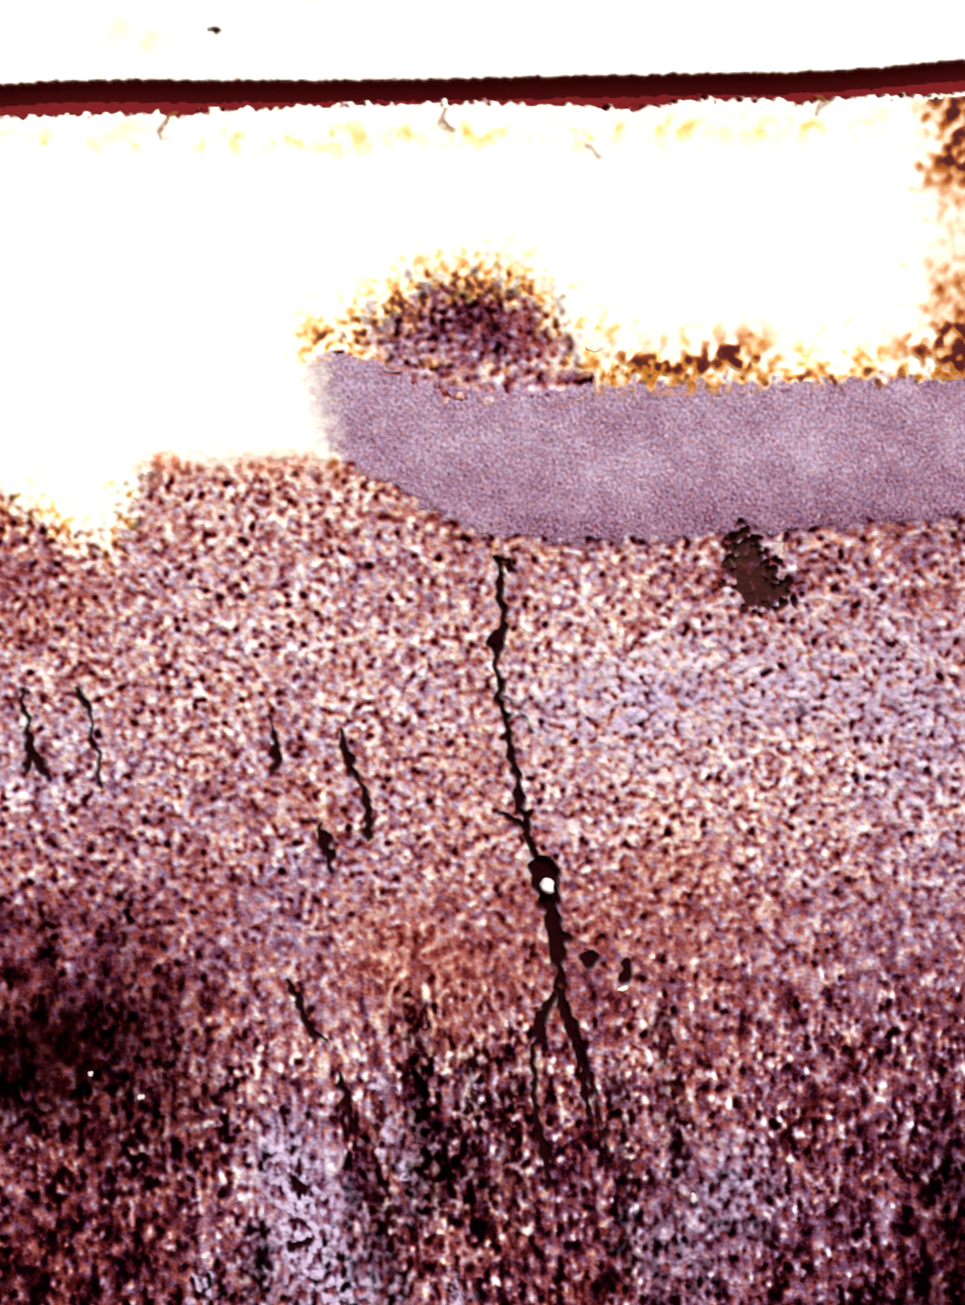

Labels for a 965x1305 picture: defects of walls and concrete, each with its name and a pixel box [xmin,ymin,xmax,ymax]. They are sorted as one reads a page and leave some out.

crack [15,684,52,785]
crack [72,685,105,792]
crack [266,714,285,774]
crack [314,726,377,877]
crack [483,553,541,855]
leakage [586,652,907,733]
leakage [0,892,180,1147]
leakage [238,991,528,1305]
crack [527,909,613,1195]
leakage [607,1058,641,1280]
leakage [651,1009,696,1178]
leakage [189,1271,214,1305]